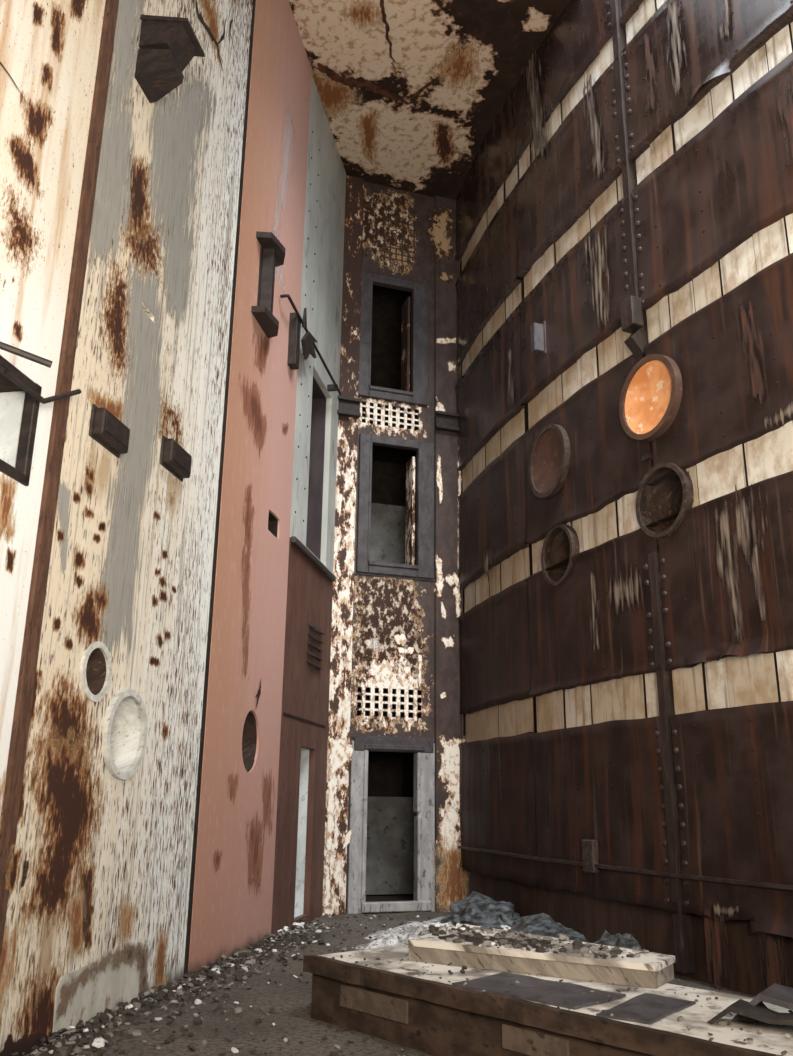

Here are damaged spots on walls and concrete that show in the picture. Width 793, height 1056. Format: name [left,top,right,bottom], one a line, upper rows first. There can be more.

corrosion [33,0,85,90]
crack [317,0,438,105]
peeling [521,6,551,32]
corrosion [1,93,52,272]
peeling [288,0,499,284]
corrosion [433,121,456,168]
corrosion [13,321,22,342]
peeling [436,337,456,345]
peeling [358,396,446,440]
peeling [433,526,463,619]
corrosion [0,668,104,1056]
corrosion [435,841,468,912]